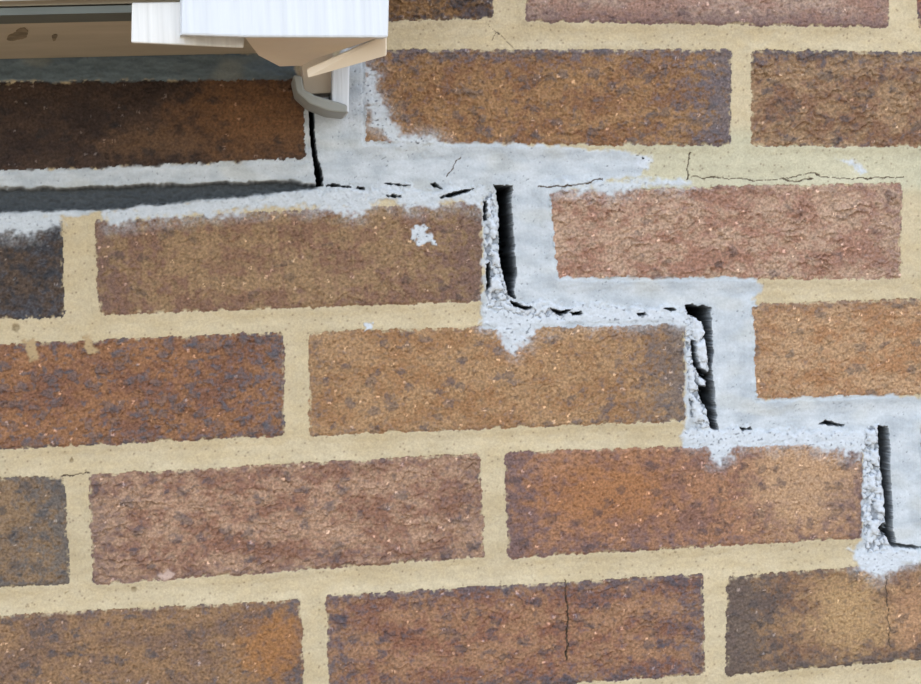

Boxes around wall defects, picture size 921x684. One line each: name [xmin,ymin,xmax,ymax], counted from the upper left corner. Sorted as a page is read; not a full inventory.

crack [686,152,904,183]
crack [636,303,752,432]
crack [818,419,845,427]
crack [877,425,921,550]